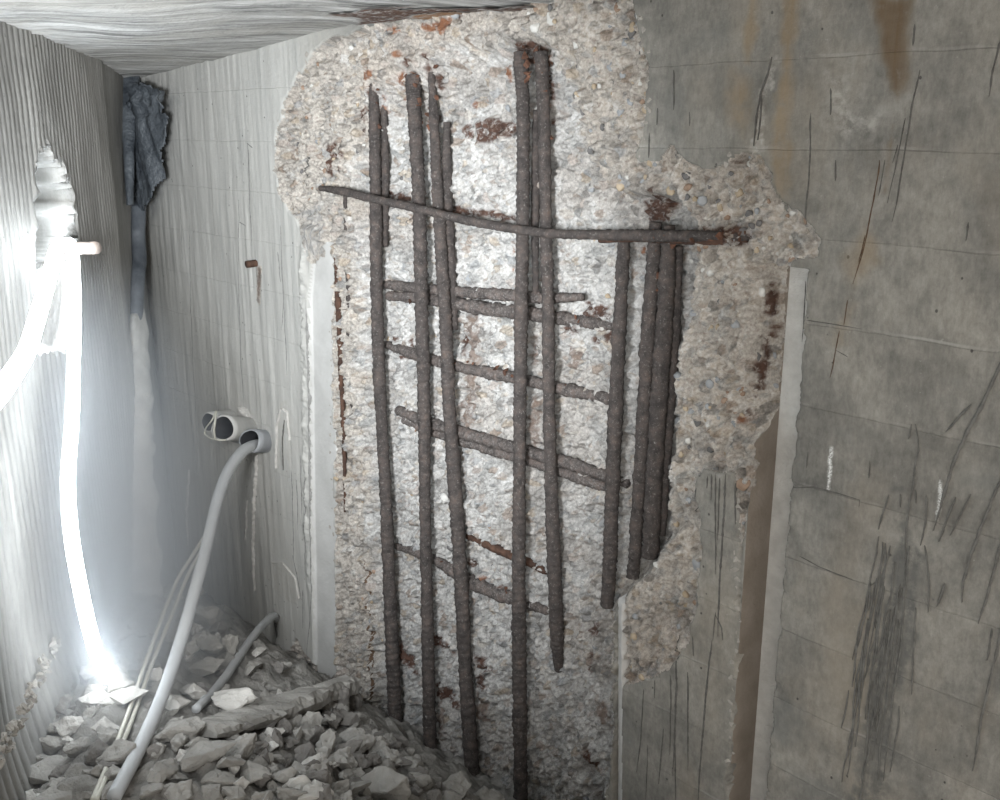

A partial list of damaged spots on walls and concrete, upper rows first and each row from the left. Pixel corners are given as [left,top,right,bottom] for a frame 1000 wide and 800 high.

rust [354,47,517,161]
rust [501,38,560,128]
rust [323,141,346,180]
rust [453,204,516,223]
rust [640,185,684,225]
crack [802,71,920,376]
rust [455,311,486,431]
rust [526,391,544,448]
spalling [272,0,821,800]
rust [559,298,614,377]
rust [733,280,785,425]
rust [435,680,461,742]